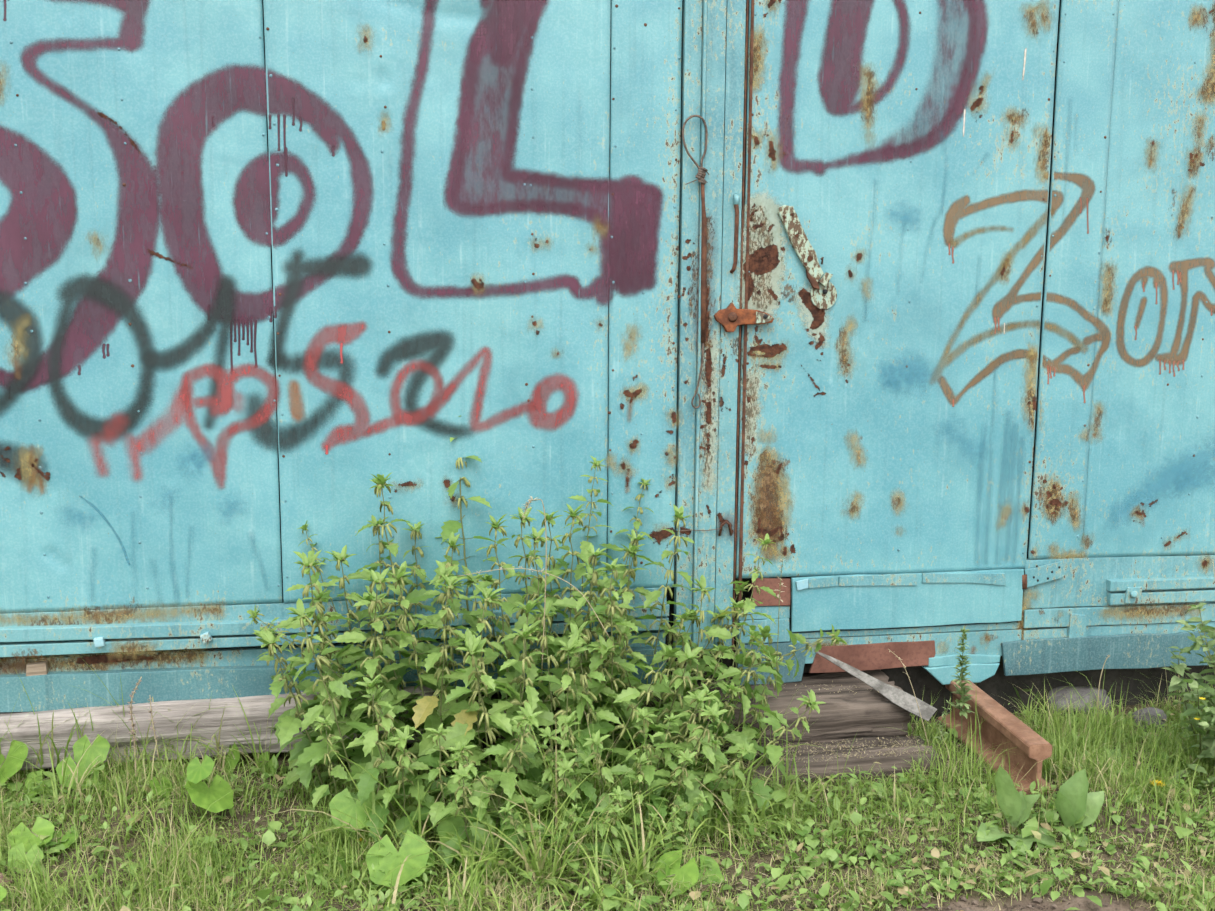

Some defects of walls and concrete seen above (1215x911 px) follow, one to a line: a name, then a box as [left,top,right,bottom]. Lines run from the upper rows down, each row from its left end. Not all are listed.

corrosion [1022,7,1049,34]
corrosion [1189,4,1215,102]
corrosion [861,69,876,127]
corrosion [1007,109,1029,144]
corrosion [1038,132,1050,180]
corrosion [1171,117,1215,238]
peeling [740,193,827,361]
corrosion [678,216,796,560]
corrosion [0,446,50,489]
corrosion [1001,479,1092,559]
corrosion [1,598,223,626]
corrosion [0,641,204,673]